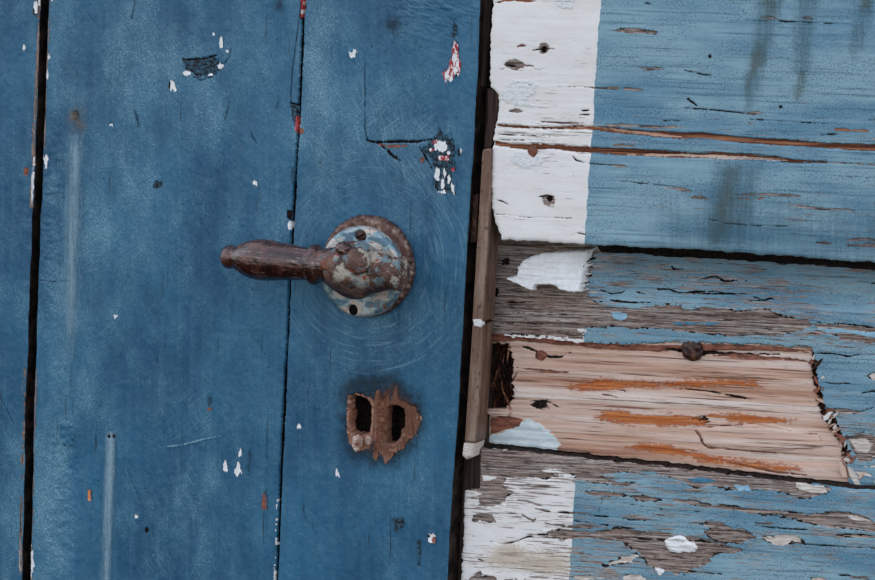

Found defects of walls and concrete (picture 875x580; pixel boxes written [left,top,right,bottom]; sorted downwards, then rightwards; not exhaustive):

peeling [182,32,232,81]
crack [364,53,432,169]
peeling [420,128,462,195]
peeling [442,19,461,87]
peeling [491,233,875,344]
peeling [468,416,875,580]